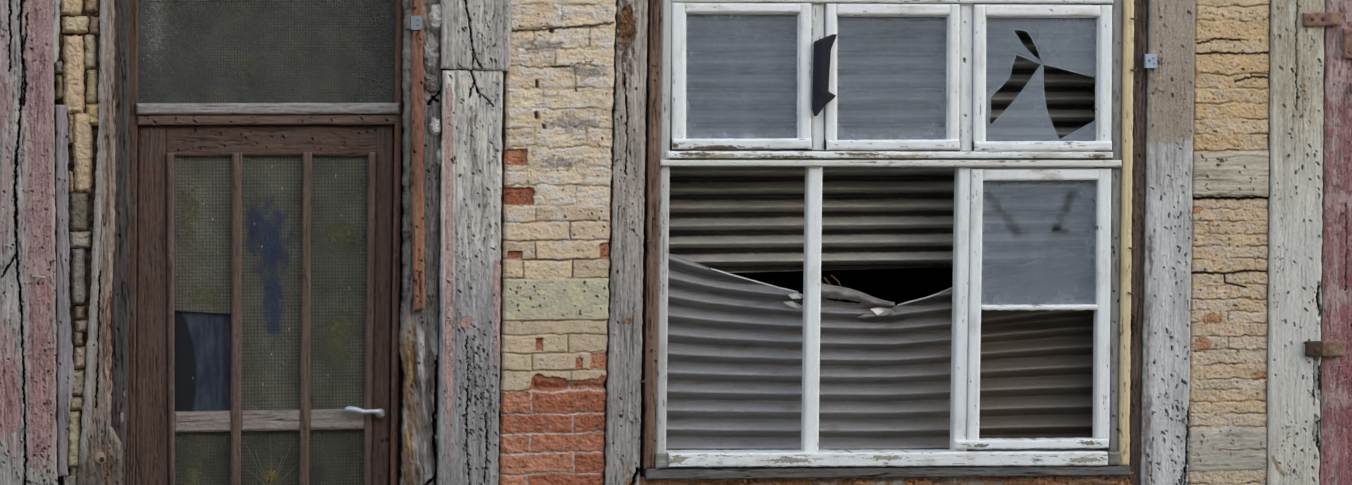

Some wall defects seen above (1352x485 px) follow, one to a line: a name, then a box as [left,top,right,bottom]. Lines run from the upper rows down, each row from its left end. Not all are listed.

crack [1,0,29,485]
crack [427,0,493,107]
peeling [1065,440,1103,463]
peeling [1323,0,1352,485]